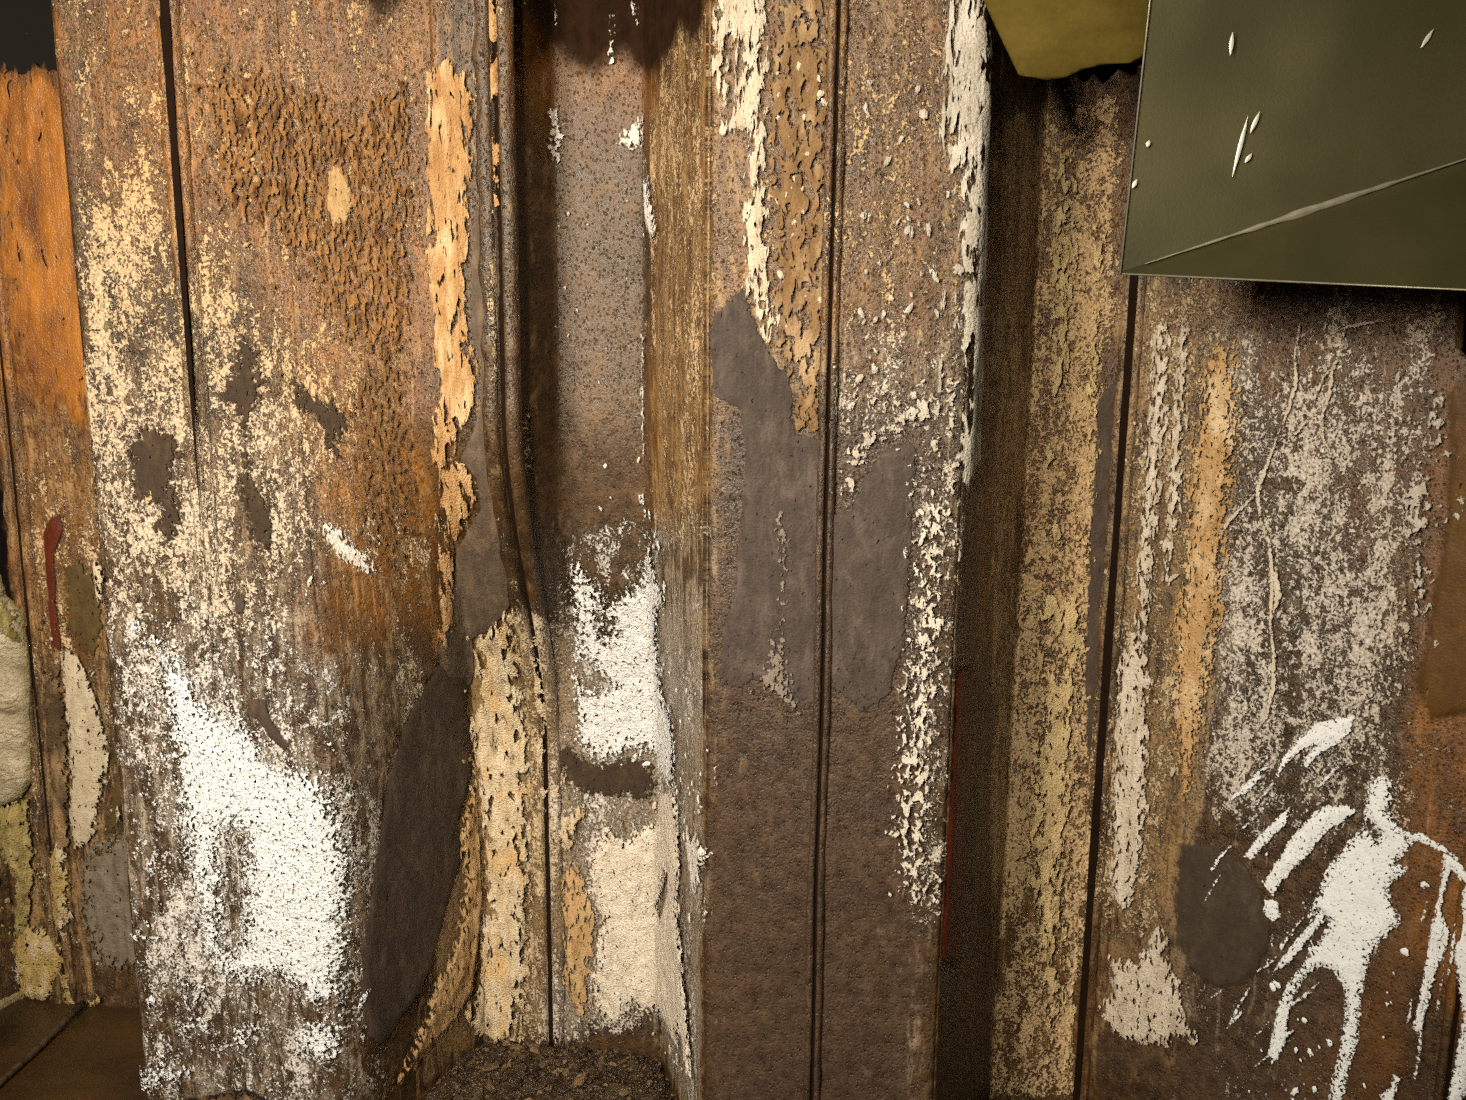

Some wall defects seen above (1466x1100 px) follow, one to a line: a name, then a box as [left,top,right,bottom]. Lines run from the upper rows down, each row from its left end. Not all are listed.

rust [0,65,87,423]
peeling [362,0,510,1043]
leakage [607,2,638,68]
leakage [643,176,656,238]
peeling [709,0,960,711]
leakage [1401,392,1447,546]
leakage [126,609,371,1070]
leakage [384,494,693,1098]
leakage [139,1049,196,1099]